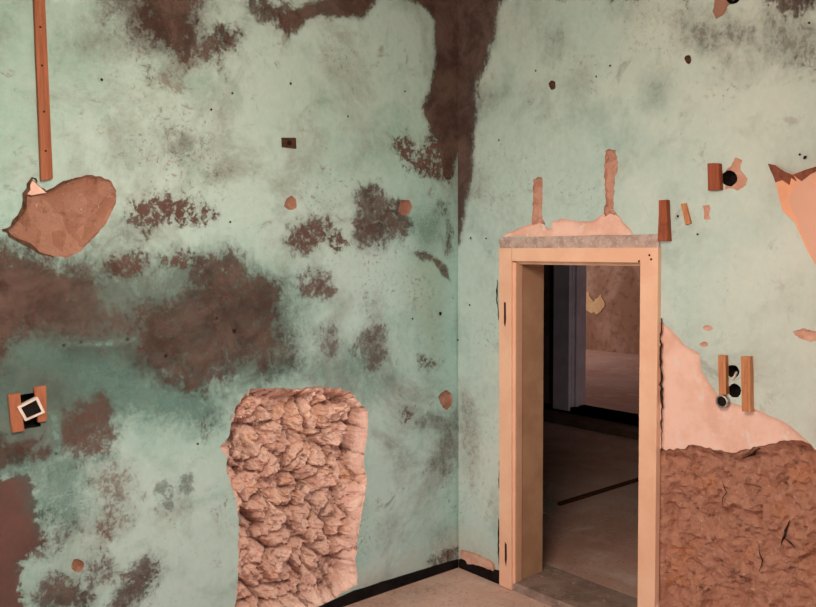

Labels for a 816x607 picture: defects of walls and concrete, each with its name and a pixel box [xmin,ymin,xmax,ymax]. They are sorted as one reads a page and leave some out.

water stain [110,0,243,64]
water stain [247,0,376,37]
water stain [765,0,815,20]
water stain [124,189,220,241]
water stain [282,183,412,257]
flaking render [504,149,633,237]
water stain [297,267,337,298]
water stain [352,325,388,371]
water stain [0,240,296,607]
spalling [220,386,368,607]
spalling [656,322,816,607]